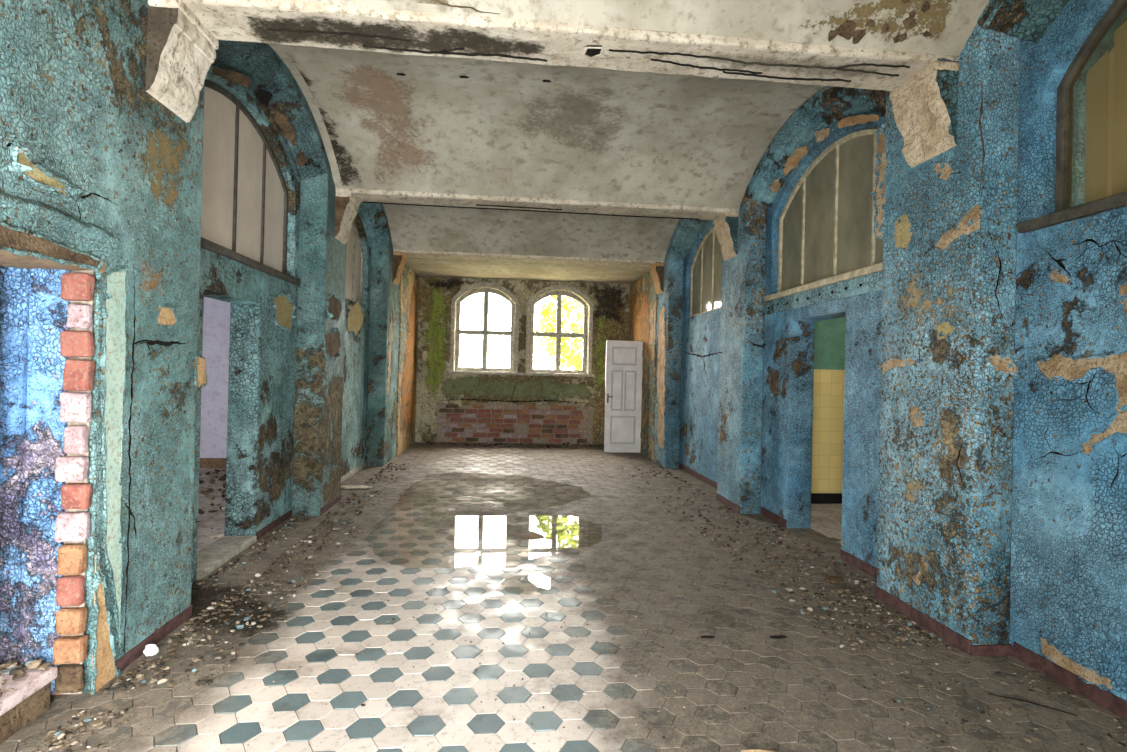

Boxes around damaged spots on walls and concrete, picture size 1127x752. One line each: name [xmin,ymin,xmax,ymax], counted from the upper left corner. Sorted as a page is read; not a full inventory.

leakage [248,16,545,56]
crack [435,0,499,14]
peeling [828,0,932,44]
crack [609,49,910,82]
peeling [10,140,88,203]
crack [76,193,119,220]
peeling [770,114,971,344]
leakage [425,279,625,400]
peeling [1032,349,1127,458]
crack [1063,372,1103,416]
flaking render [0,219,162,695]
crack [1110,446,1127,488]